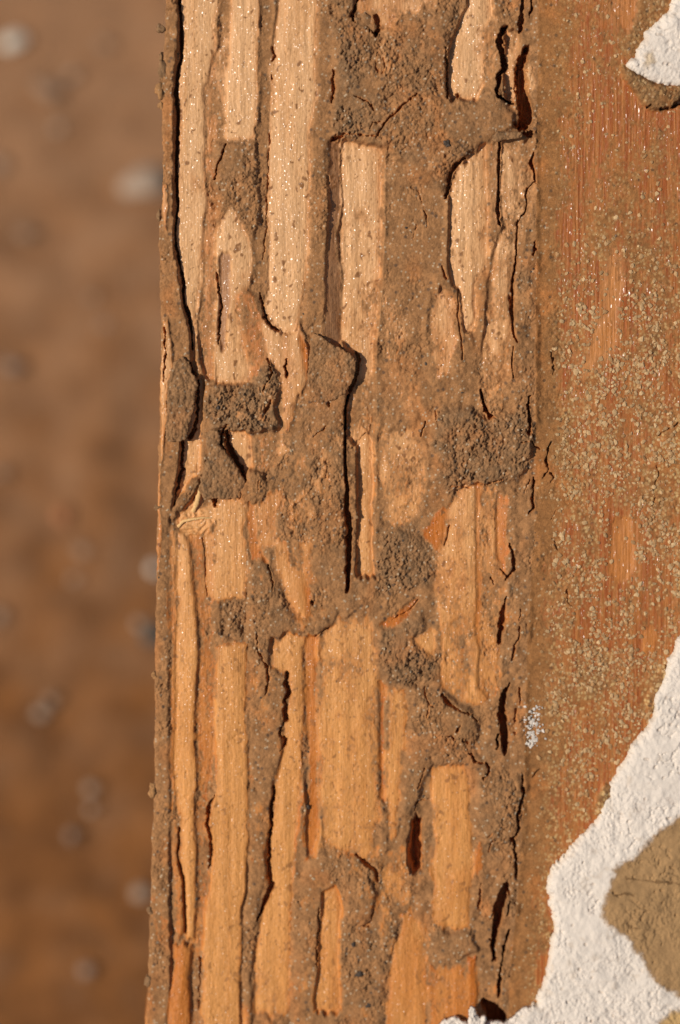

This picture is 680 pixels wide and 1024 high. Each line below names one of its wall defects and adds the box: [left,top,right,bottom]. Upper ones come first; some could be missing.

peeling [612,0,639,34]
peeling [439,1005,534,1024]